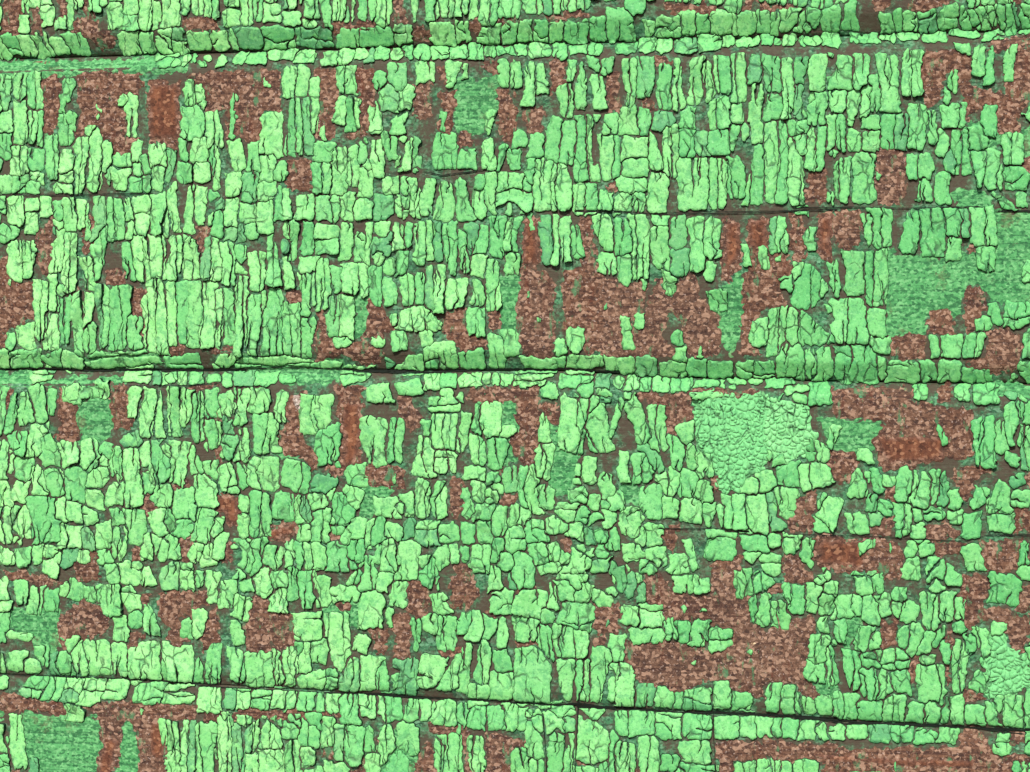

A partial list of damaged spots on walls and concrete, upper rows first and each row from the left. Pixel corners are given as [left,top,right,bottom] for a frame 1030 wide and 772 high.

peeling [0,0,283,156]
peeling [921,33,1030,173]
crack [0,0,1030,359]
peeling [0,215,54,348]
peeling [442,168,863,359]
peeling [211,285,407,519]
crack [0,191,1030,772]
peeling [465,384,581,497]
peeling [816,380,999,502]
peeling [592,554,839,700]
peeling [924,507,1030,653]
peeling [0,692,341,772]